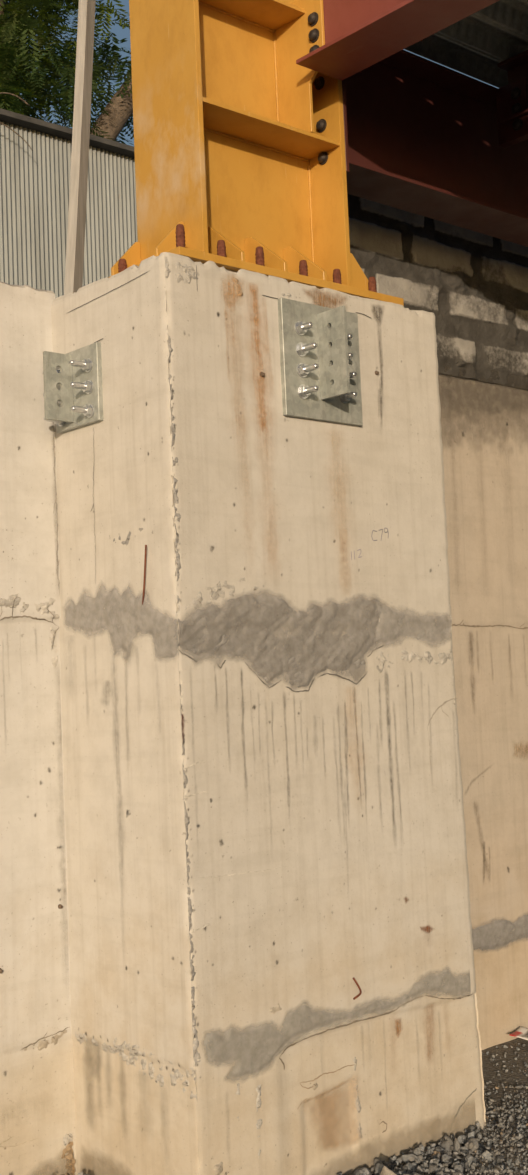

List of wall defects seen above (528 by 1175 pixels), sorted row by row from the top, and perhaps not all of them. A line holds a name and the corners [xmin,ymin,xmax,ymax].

crack [0,427,60,648]
crack [452,620,528,629]
spalling [22,672,201,1099]
crack [21,1027,68,1050]